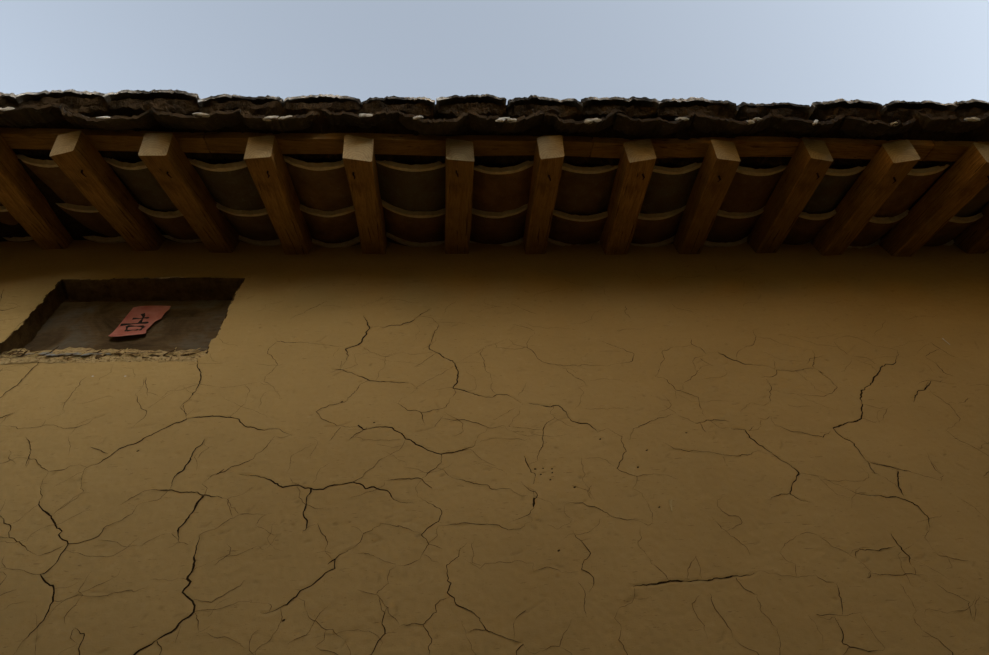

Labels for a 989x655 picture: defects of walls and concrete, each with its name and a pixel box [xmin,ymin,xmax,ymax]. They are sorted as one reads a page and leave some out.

crack [0,281,989,655]